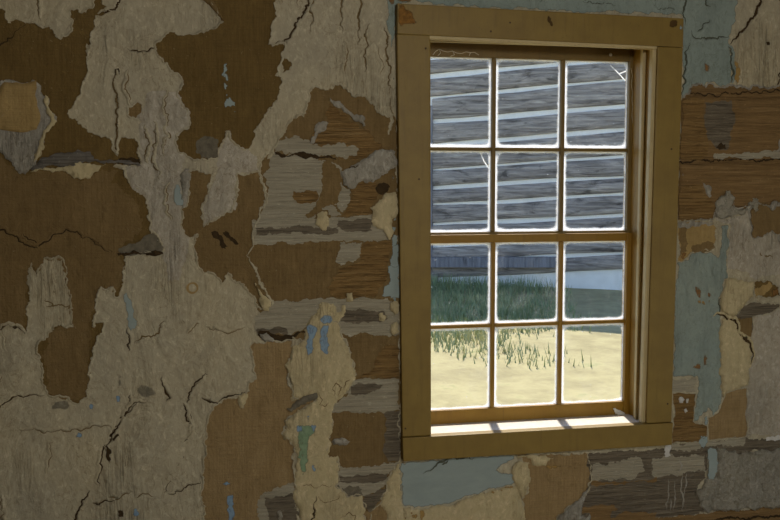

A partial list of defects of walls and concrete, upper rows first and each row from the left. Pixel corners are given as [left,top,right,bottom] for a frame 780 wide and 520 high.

crack [272,0,318,47]
crack [340,0,395,135]
crack [681,0,765,95]
peeling [0,0,165,405]
peeling [153,0,402,520]
peeling [676,219,718,263]
peeling [664,278,780,457]
crack [713,298,755,365]
crack [19,373,250,520]
peeling [511,451,593,520]